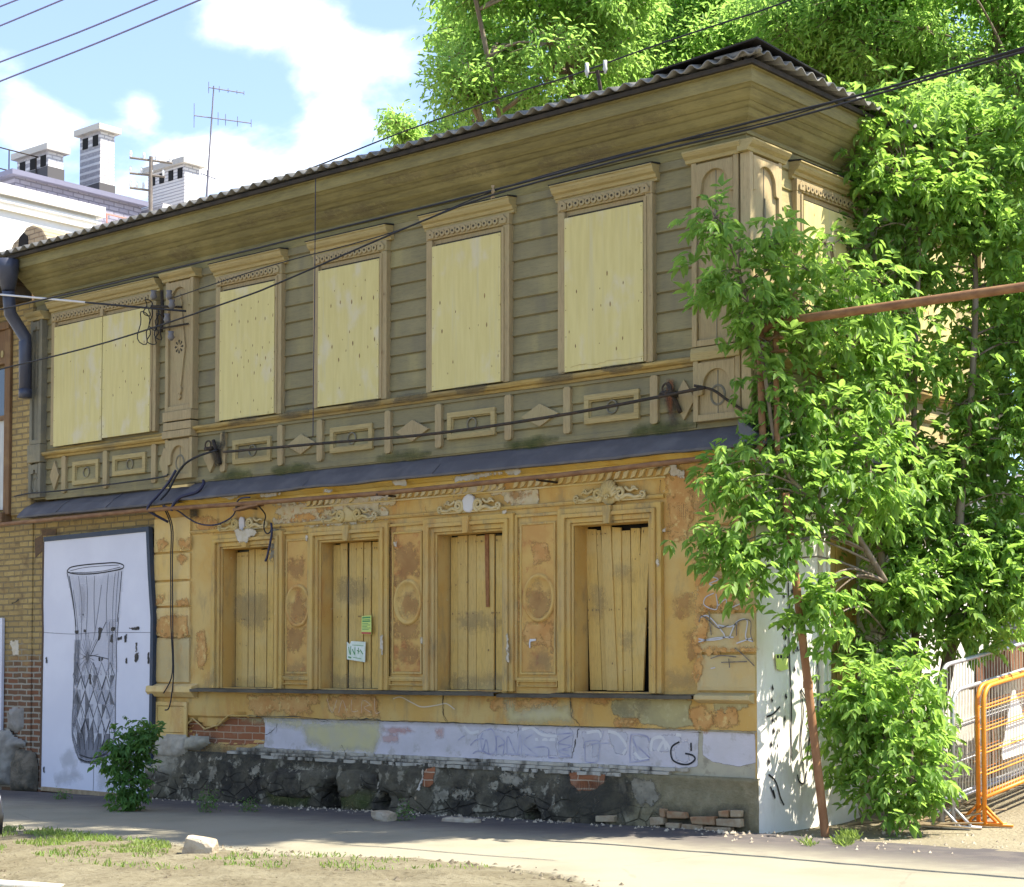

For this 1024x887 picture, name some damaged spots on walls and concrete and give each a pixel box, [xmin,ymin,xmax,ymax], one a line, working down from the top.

flaking render [451,469,540,514]
peeling [662,465,741,542]
flaking render [260,479,423,670]
peeling [156,595,207,670]
peeling [505,591,554,662]
flaking render [186,693,379,784]
peeling [689,704,738,731]
flaking render [551,772,605,808]